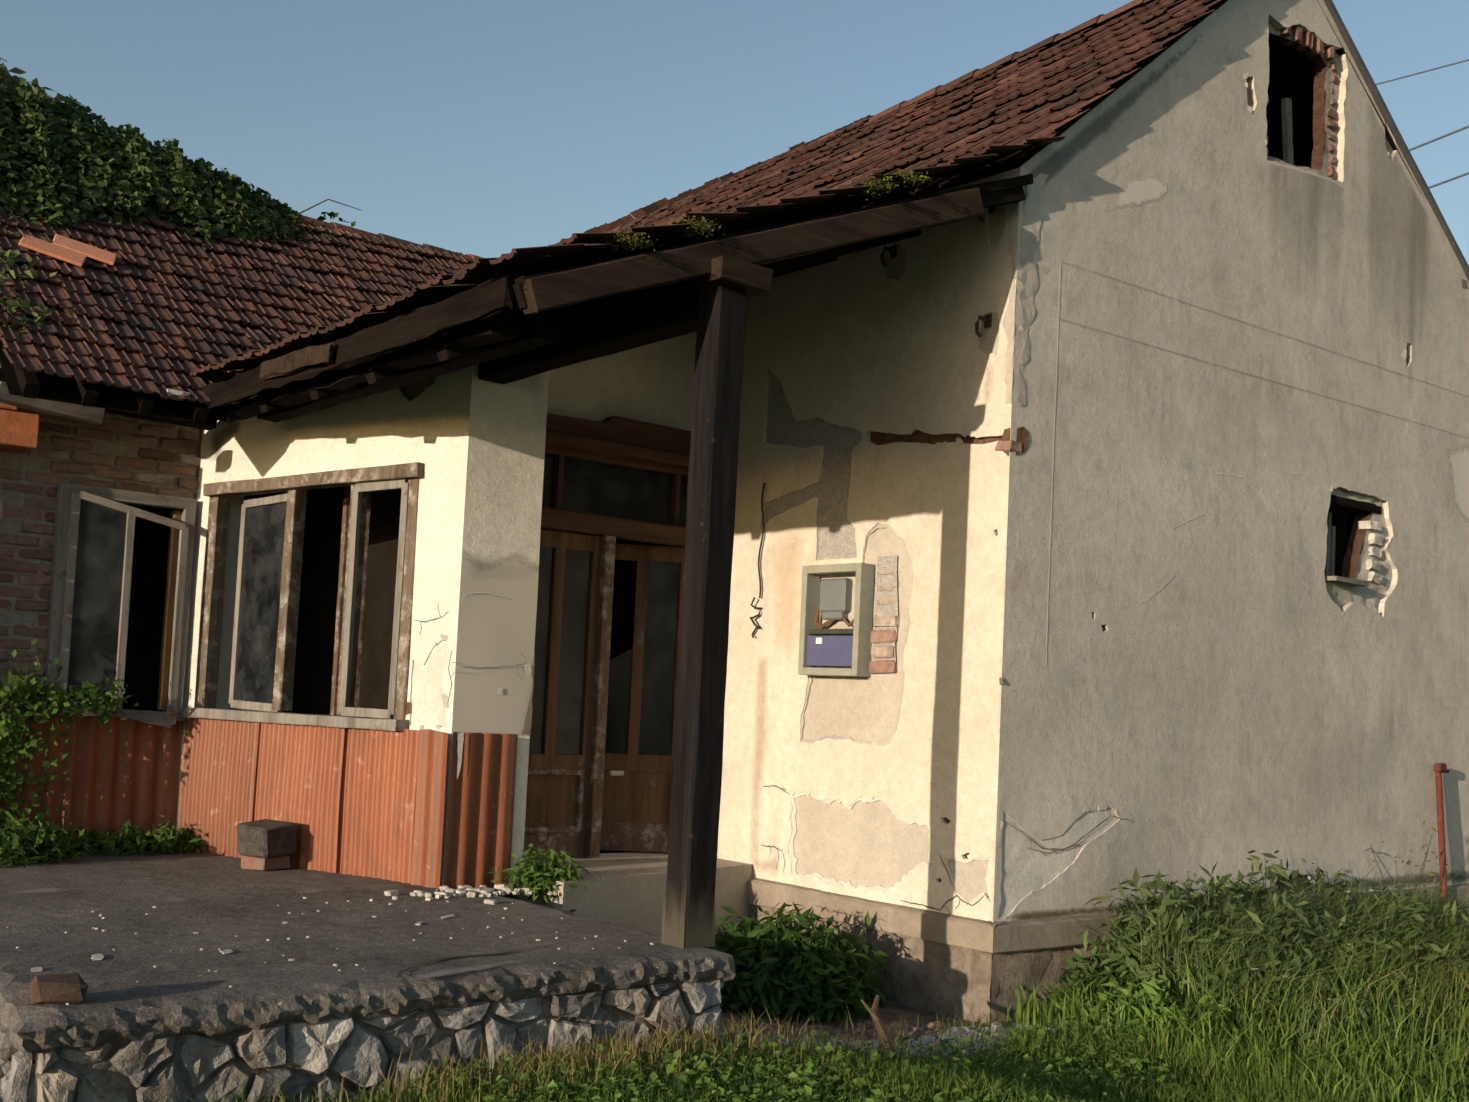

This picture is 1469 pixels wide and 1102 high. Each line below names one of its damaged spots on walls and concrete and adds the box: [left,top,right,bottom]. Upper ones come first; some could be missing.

flaking render [1265,16,1348,180]
flaking render [995,439,1023,453]
peeling [1446,447,1469,522]
crack [415,592,509,633]
flaking render [800,523,914,746]
crack [447,652,528,705]
flaking render [786,790,1119,920]